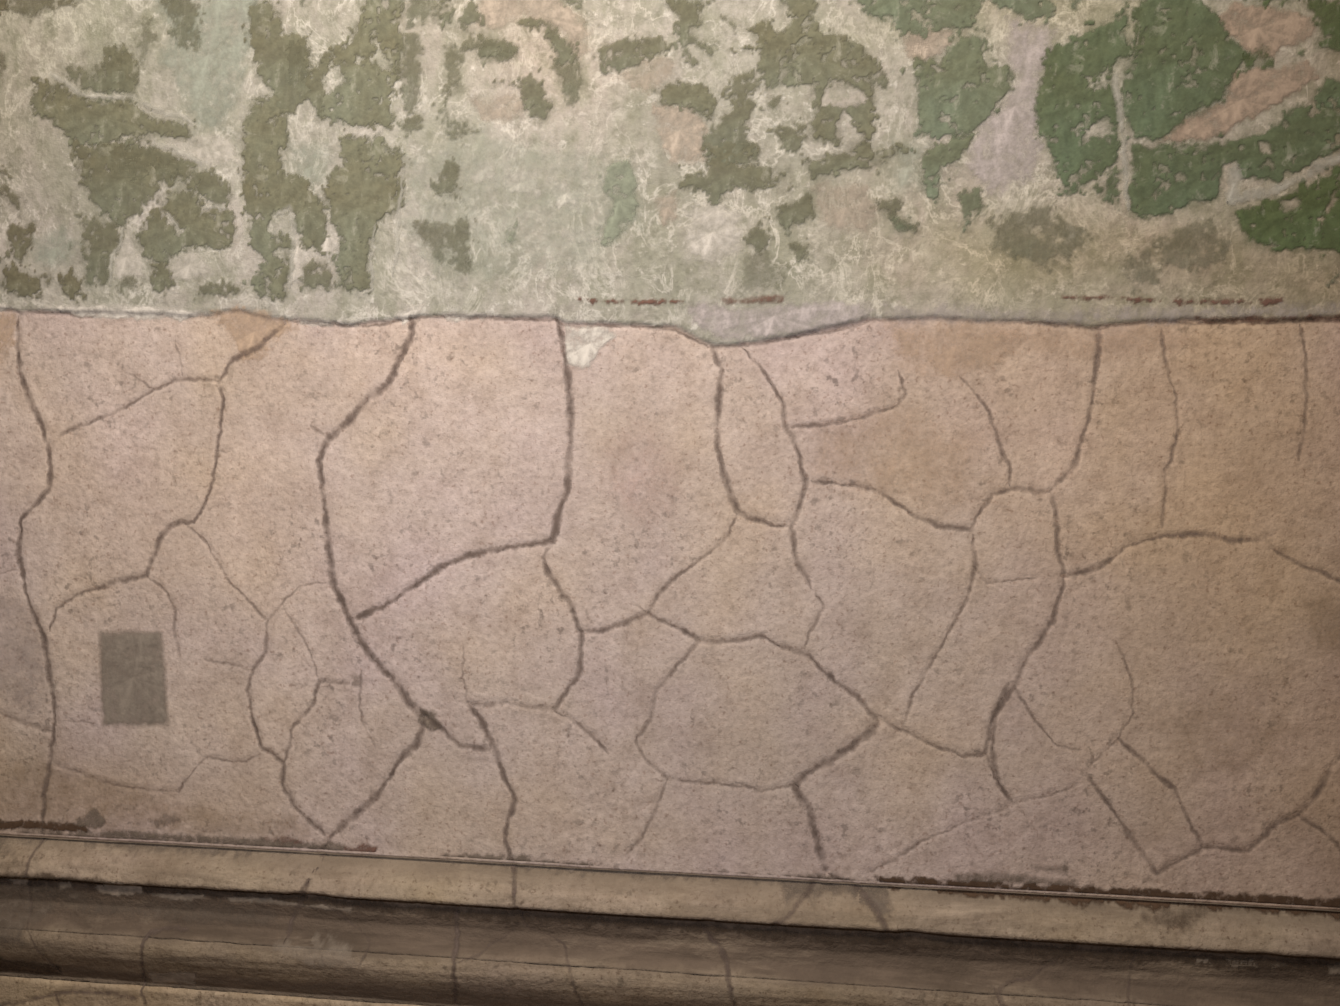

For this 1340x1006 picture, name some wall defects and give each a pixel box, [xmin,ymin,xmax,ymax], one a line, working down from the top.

peeling [0,0,1056,359]
peeling [1034,0,1340,256]
crack [17,321,271,869]
crack [247,316,693,931]
crack [733,634,902,851]
crack [655,326,1010,697]
crack [931,688,1013,757]
crack [1036,347,1249,645]
crack [1154,783,1323,874]
crack [0,926,186,1006]
crack [705,929,734,1003]